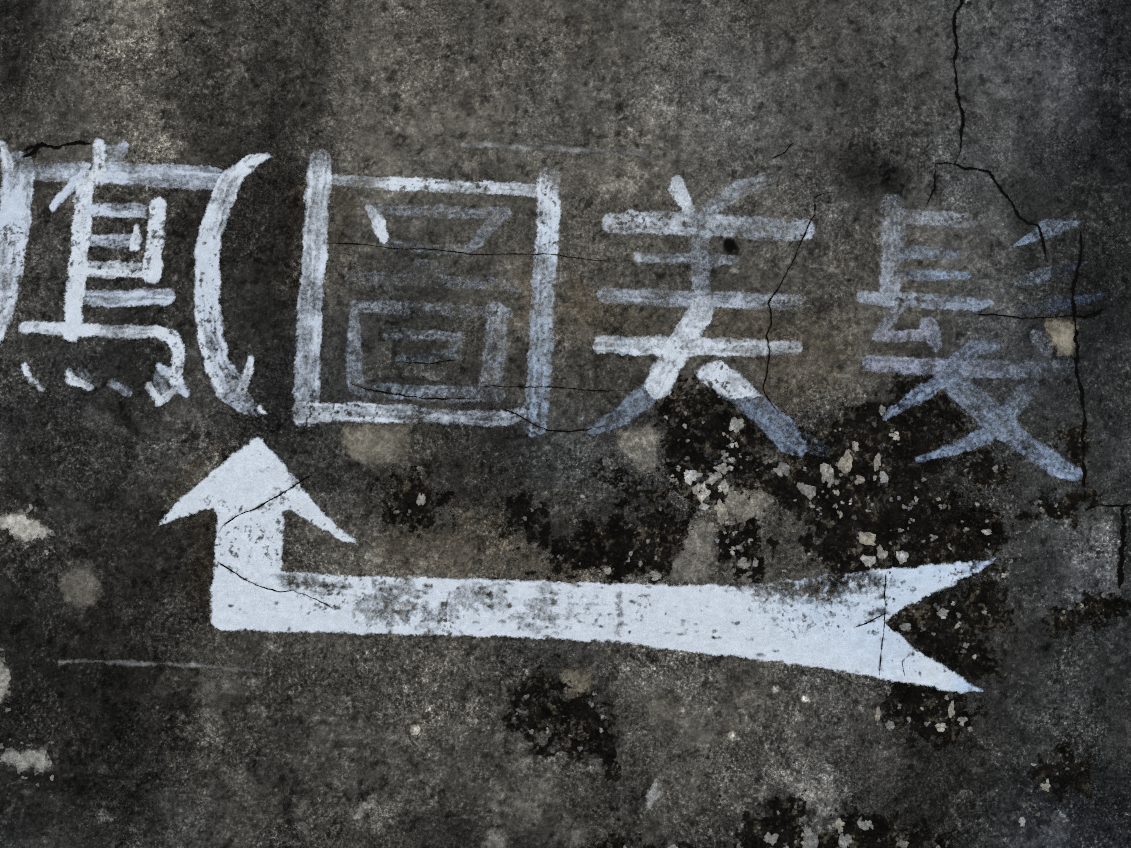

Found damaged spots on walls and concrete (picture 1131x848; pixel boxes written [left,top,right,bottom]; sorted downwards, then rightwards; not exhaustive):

damp [86,0,178,78]
crack [926,0,1048,262]
damp [194,0,328,452]
crack [976,231,1131,588]
crack [219,474,312,532]
crack [218,562,335,610]
spalling [340,421,456,538]
peeling [496,361,1105,755]
spalling [0,648,11,712]
spalling [0,734,55,787]
peeling [497,653,622,783]
peeling [566,789,960,848]